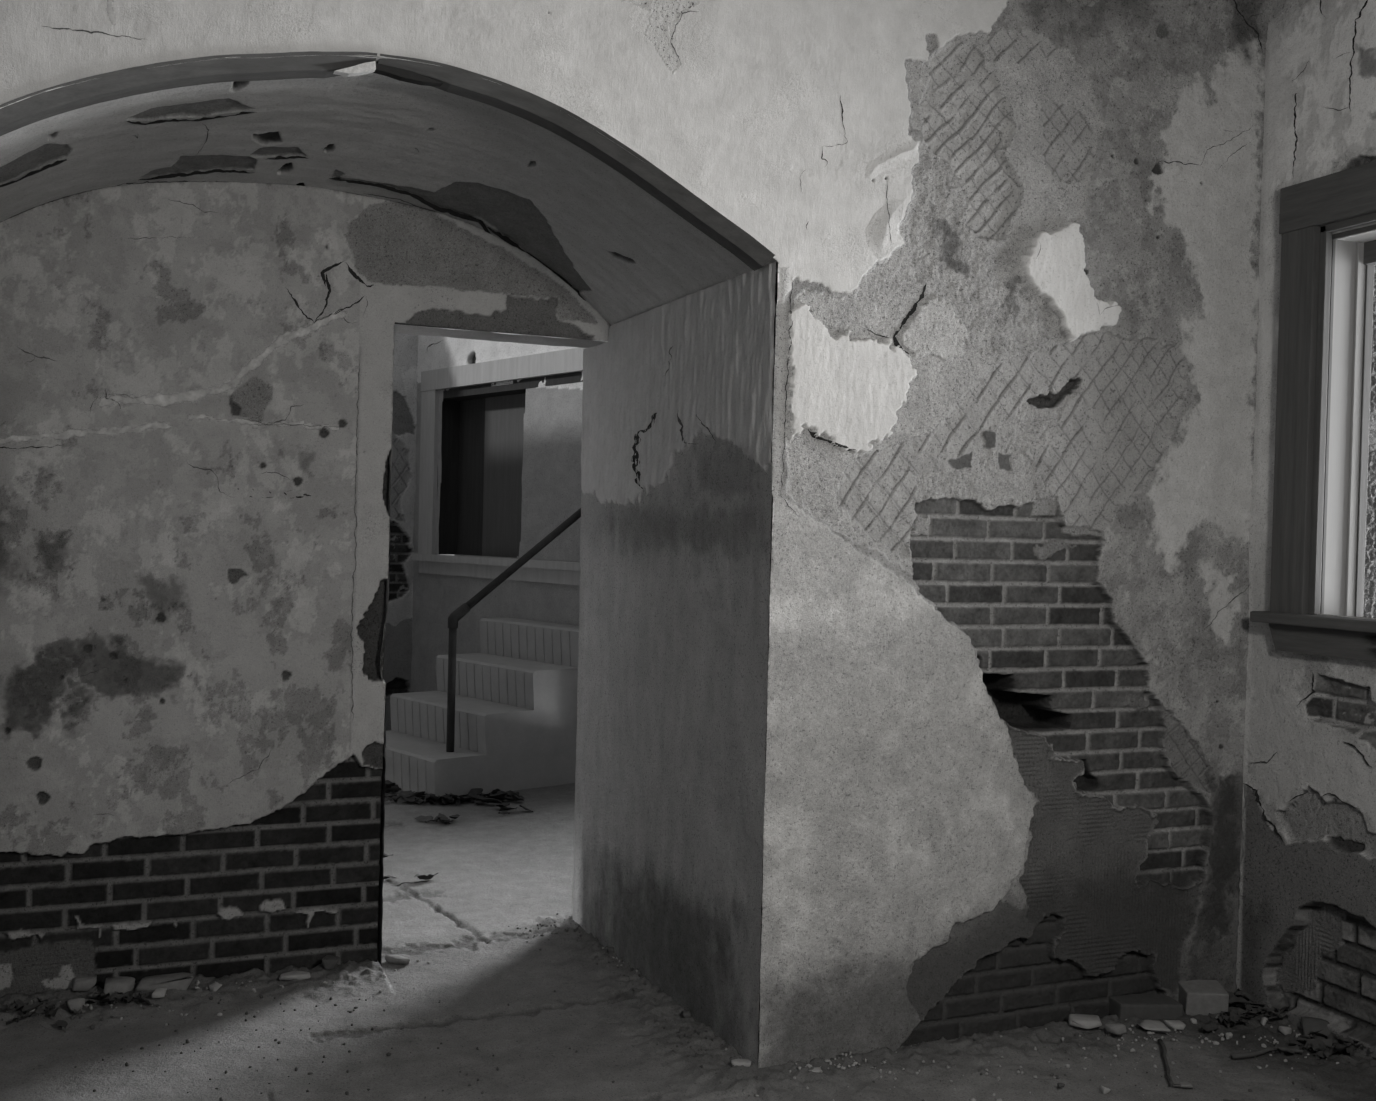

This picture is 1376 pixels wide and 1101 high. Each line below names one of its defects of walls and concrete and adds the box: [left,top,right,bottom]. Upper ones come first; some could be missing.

peeling [127,98,256,122]
peeling [0,143,71,184]
peeling [139,132,307,178]
crack [285,261,373,323]
flaking render [320,420,347,437]
flaking render [332,33,1213,889]
flaking render [1305,673,1376,749]
flaking render [1327,836,1365,853]
flaking render [0,741,383,998]
flaking render [1260,902,1376,1047]
flaking render [1164,1018,1197,1030]